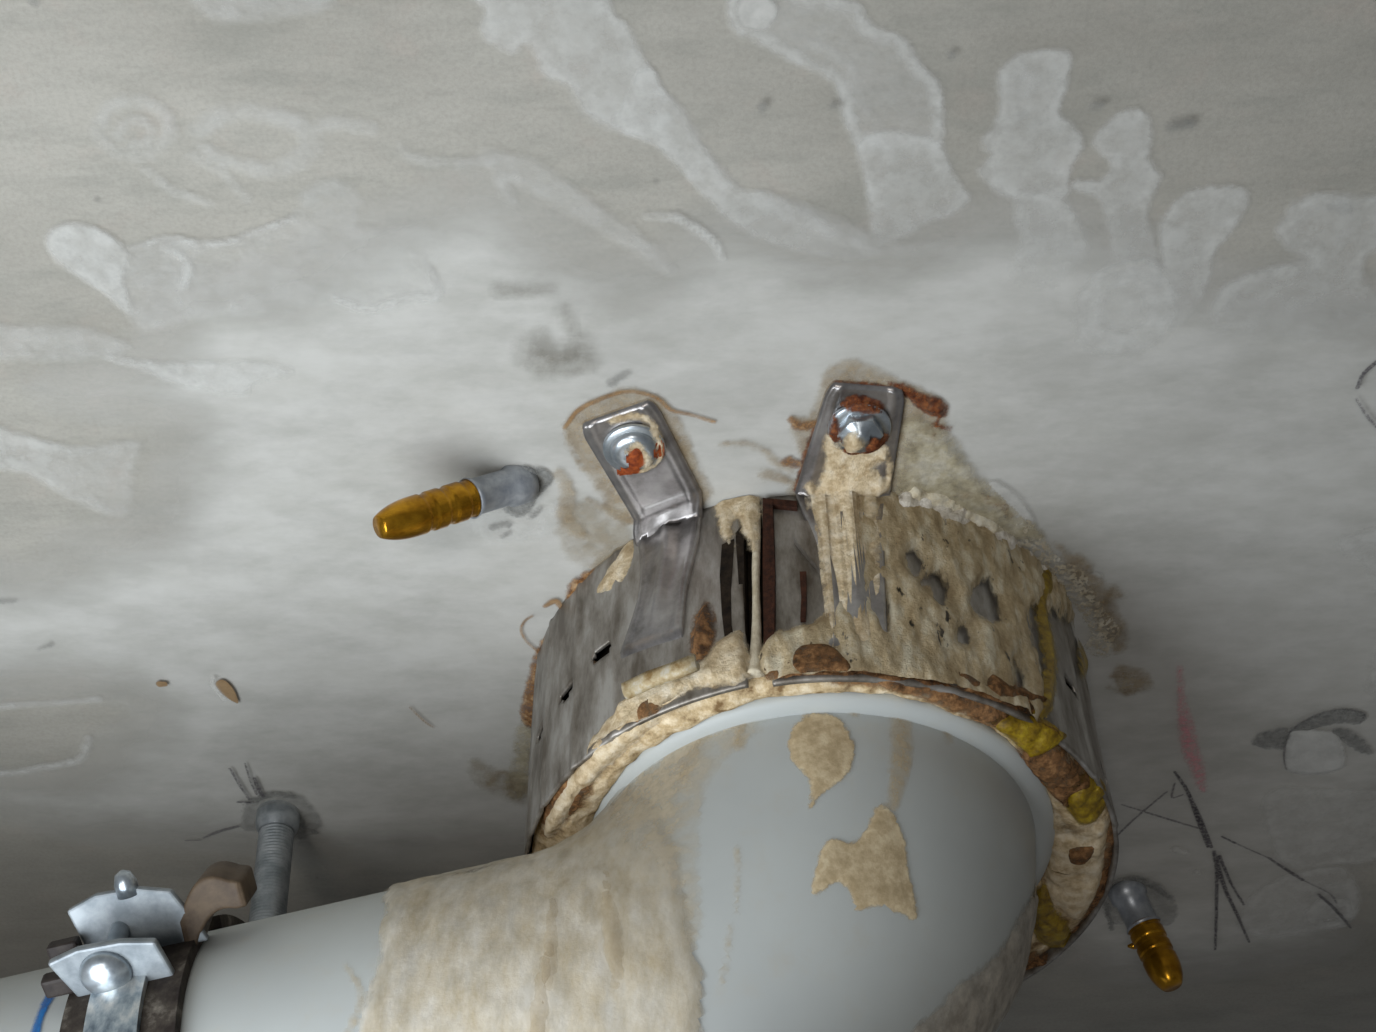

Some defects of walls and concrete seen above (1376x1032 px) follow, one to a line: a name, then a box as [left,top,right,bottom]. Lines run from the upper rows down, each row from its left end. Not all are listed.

leakage [484,0,729,208]
leakage [730,0,803,63]
leakage [831,0,948,204]
leakage [988,133,1105,229]
leakage [1034,51,1069,135]
leakage [0,214,1376,965]
leakage [360,809,702,1032]